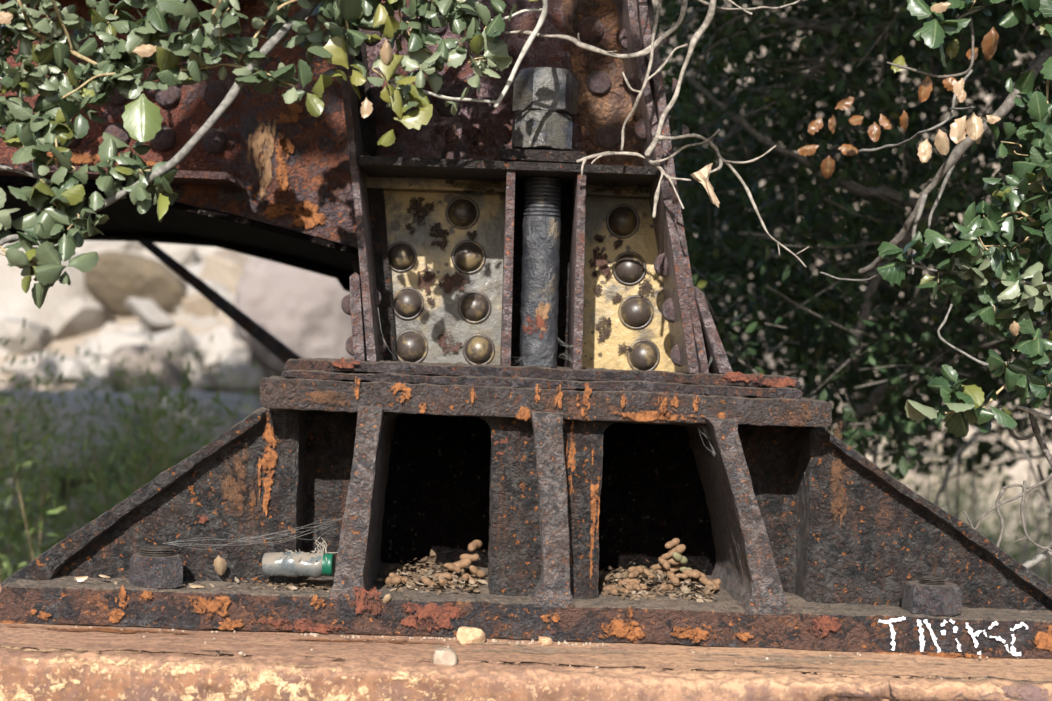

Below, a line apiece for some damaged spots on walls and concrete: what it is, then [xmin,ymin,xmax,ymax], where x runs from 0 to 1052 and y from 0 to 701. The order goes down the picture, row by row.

rust [247,102,328,229]
rust [297,357,361,406]
rust [391,382,426,413]
rust [516,384,541,422]
rust [613,390,705,422]
rust [216,412,278,516]
rust [590,479,600,583]
rust [0,585,188,634]
rust [186,595,469,644]
rust [598,606,648,641]
rust [670,625,717,643]
rust [1034,625,1052,651]